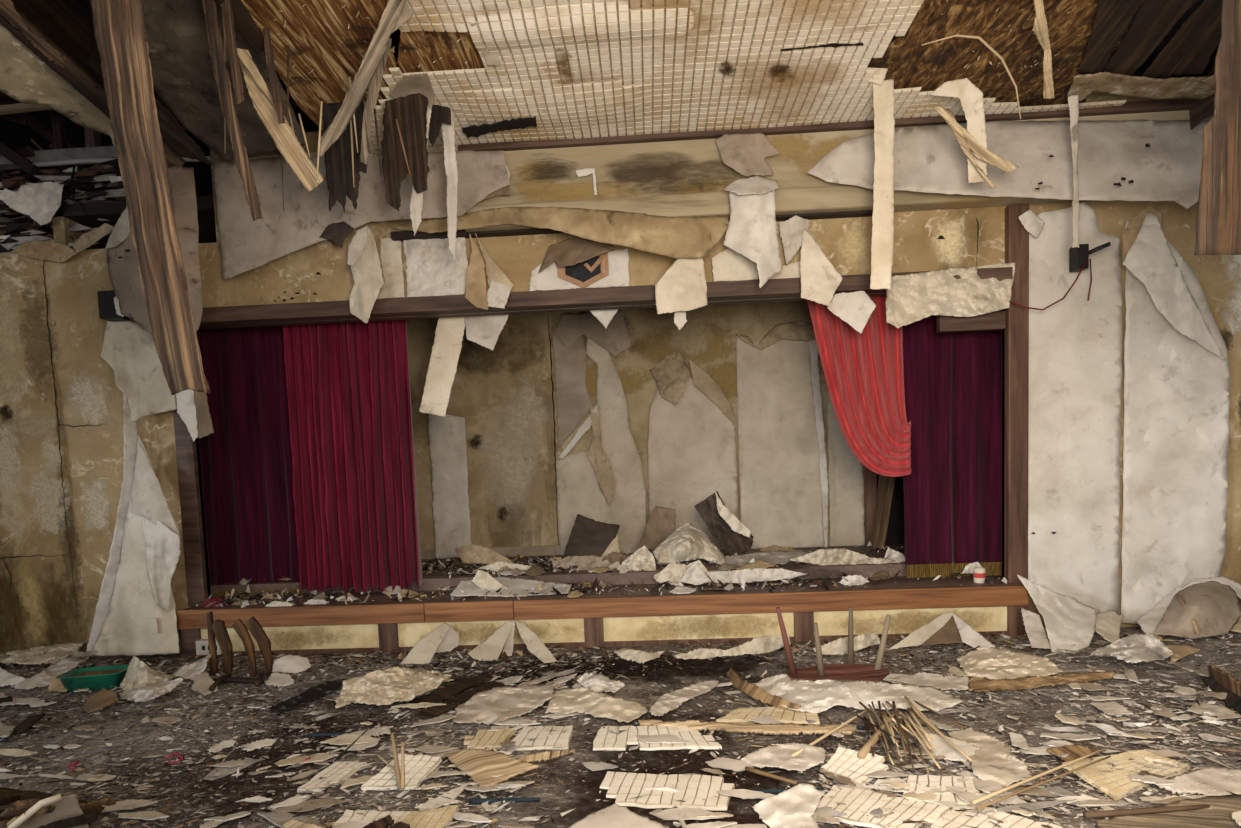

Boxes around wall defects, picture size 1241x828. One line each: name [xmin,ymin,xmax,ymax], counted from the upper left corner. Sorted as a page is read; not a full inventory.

peeling [241,0,484,132]
damp [557,49,571,78]
damp [771,65,789,81]
peeling [212,150,510,279]
peeling [807,133,875,189]
peeling [867,0,1226,360]
damp [1221,255,1241,348]
peeling [559,405,599,459]
peeling [809,339,829,547]
damp [0,566,85,652]